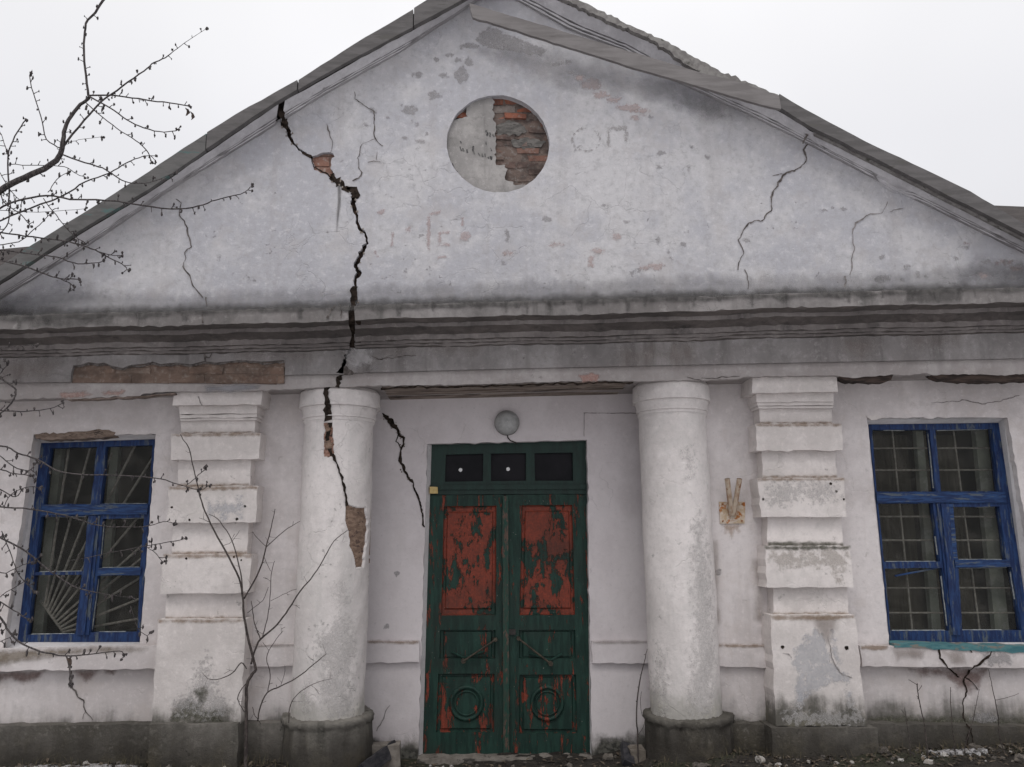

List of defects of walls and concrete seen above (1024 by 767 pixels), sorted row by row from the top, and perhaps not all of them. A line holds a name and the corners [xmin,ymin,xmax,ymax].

spalling [493,99,549,185]
crack [176,199,207,323]
crack [277,92,416,506]
crack [738,130,810,288]
crack [844,201,903,287]
spalling [67,360,285,402]
spalling [837,375,893,385]
spalling [926,374,1024,384]
spalling [35,429,119,442]
crack [382,413,425,527]
spalling [345,505,371,567]
crack [938,649,992,746]